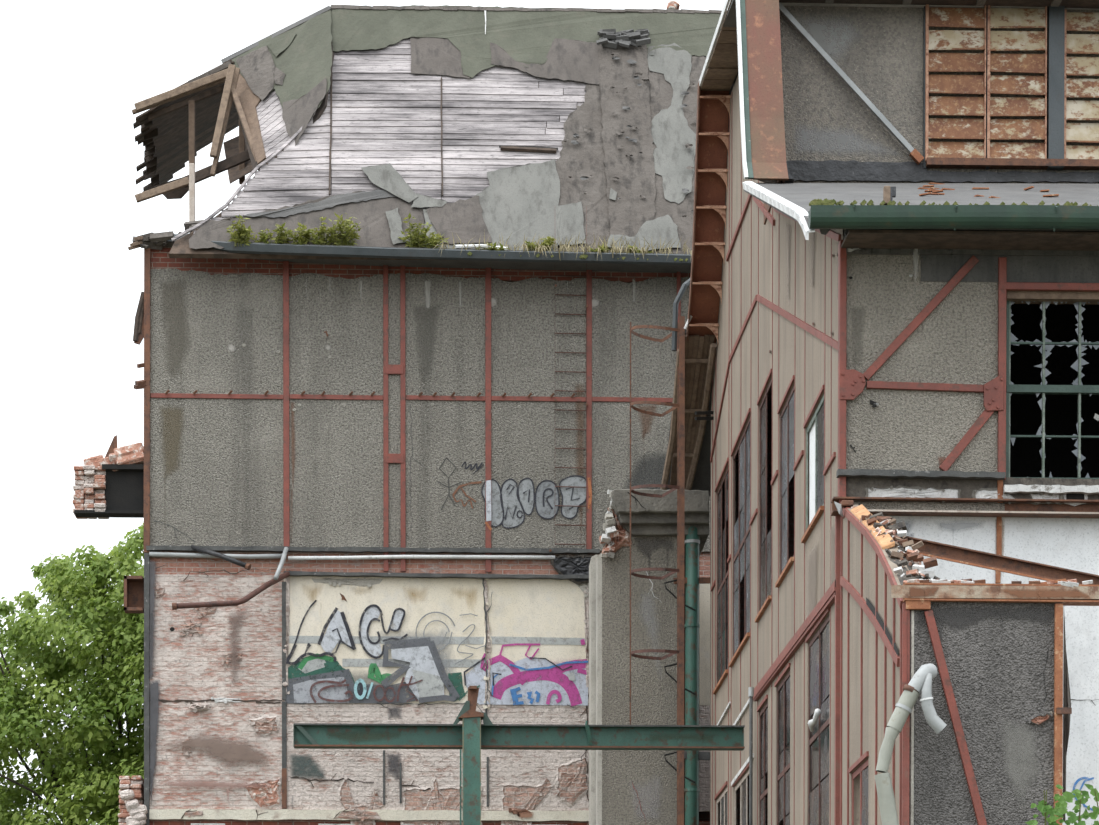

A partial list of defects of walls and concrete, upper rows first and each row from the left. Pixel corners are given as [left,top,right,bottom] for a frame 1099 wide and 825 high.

leakage [164,410,181,471]
spalling [599,490,632,558]
spalling [834,477,1099,585]
spalling [170,607,217,637]
leakage [149,561,267,796]
spalling [248,714,280,738]
spalling [243,777,282,809]
spalling [336,776,384,825]
spalling [400,776,460,825]
spalling [501,756,589,825]